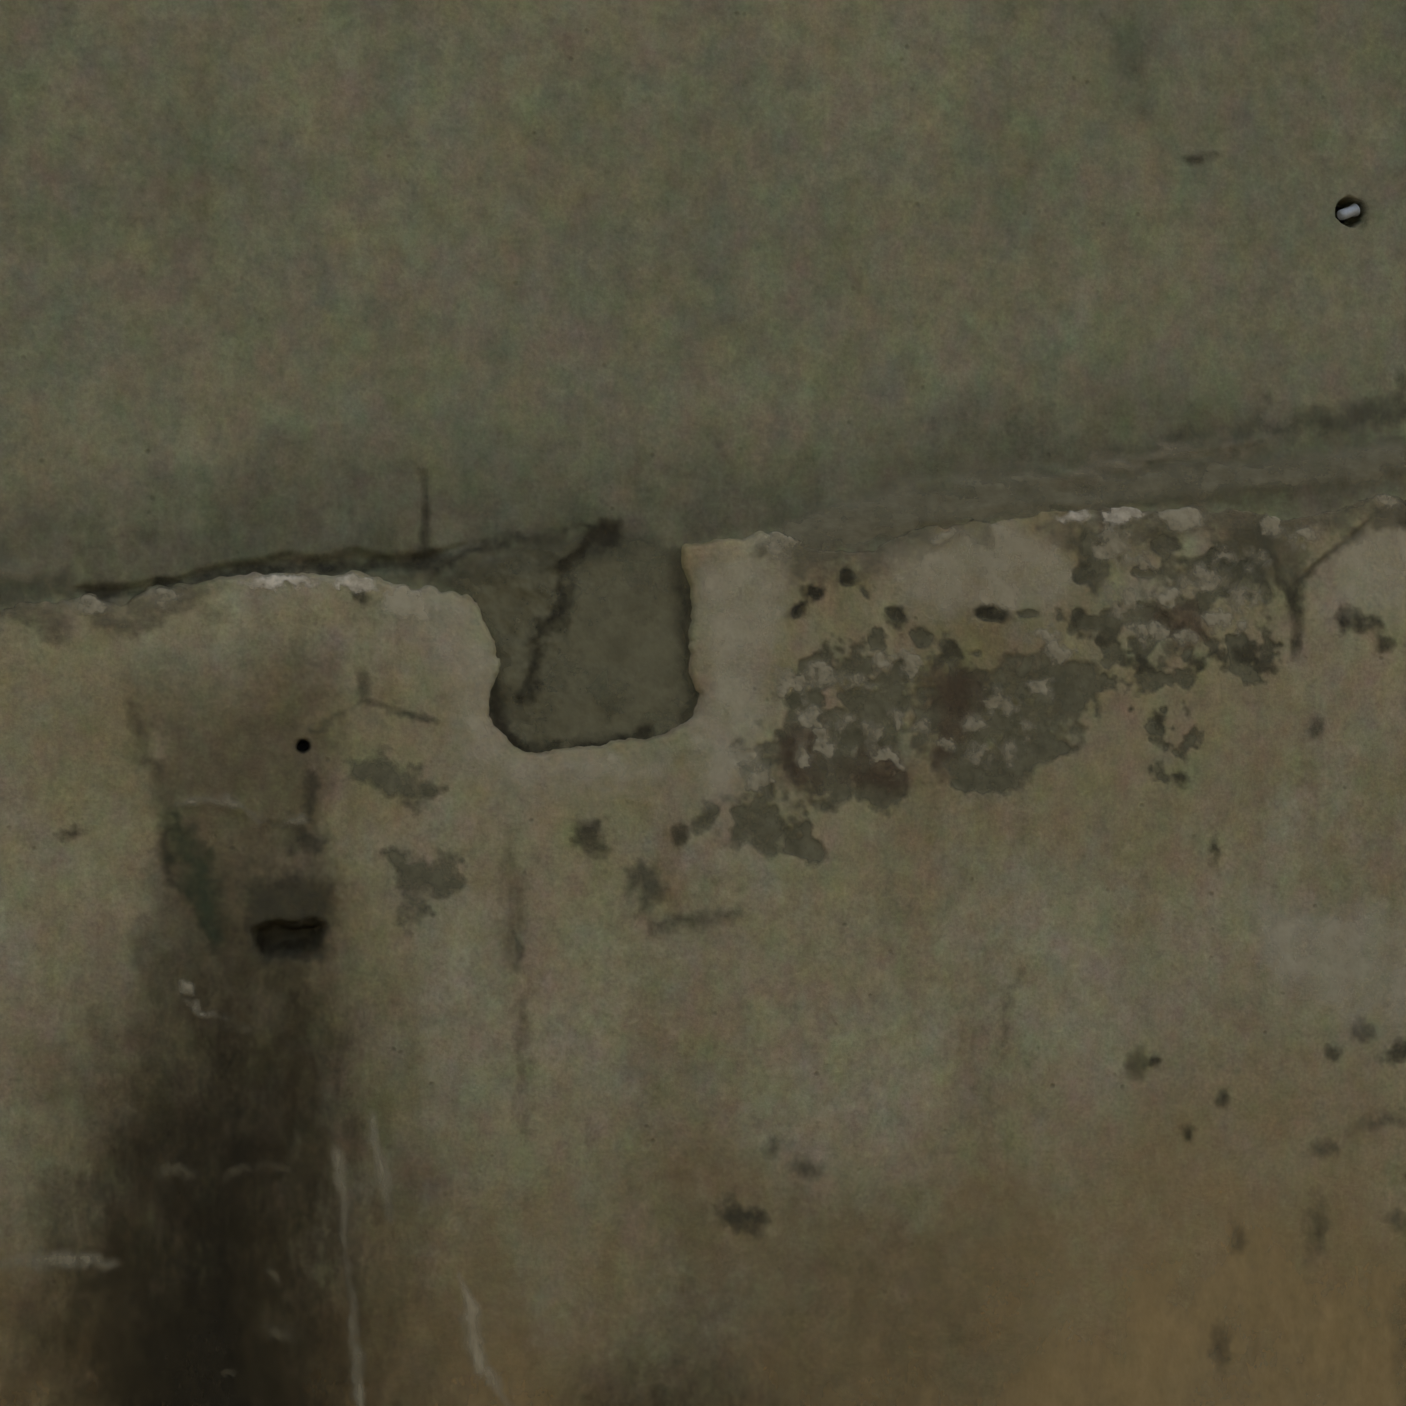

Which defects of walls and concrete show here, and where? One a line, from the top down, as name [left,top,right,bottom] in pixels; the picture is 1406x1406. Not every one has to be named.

crack [156,503,526,586]
crack [85,588,122,599]
spalling [443,521,696,753]
peeling [673,506,1317,864]
peeling [351,759,446,797]
peeling [381,849,463,918]
damp [101,981,346,1406]